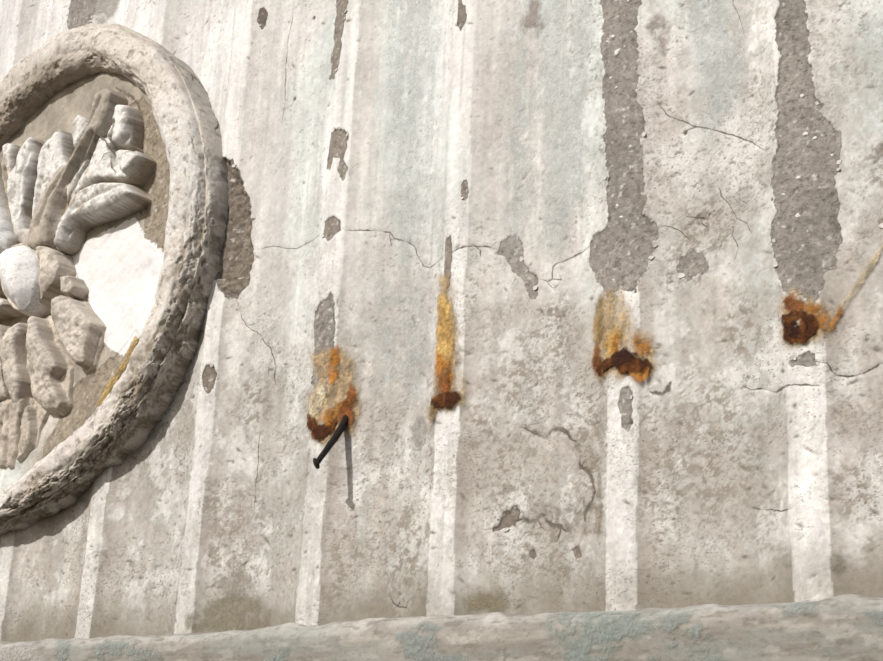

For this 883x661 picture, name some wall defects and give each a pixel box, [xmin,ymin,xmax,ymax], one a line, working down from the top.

spalling [329,0,348,80]
spalling [327,127,349,180]
spalling [589,0,659,297]
spalling [770,0,843,306]
spalling [215,157,255,299]
spalling [310,293,335,389]
rust [307,346,360,443]
crack [360,229,491,268]
rust [428,275,465,422]
rust [592,291,655,382]
rust [781,247,881,344]
crack [517,427,596,538]